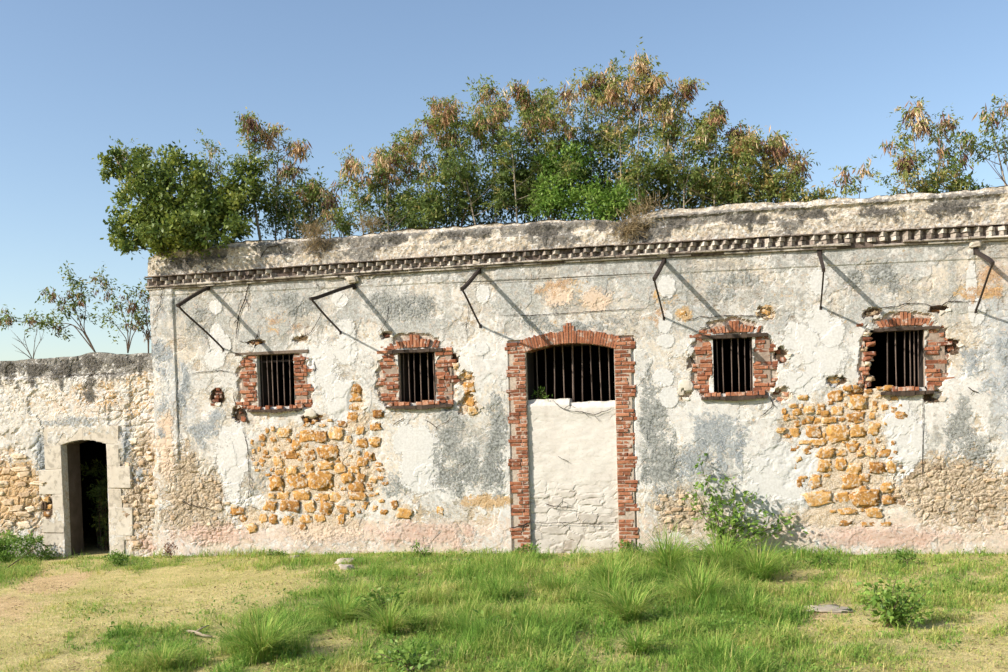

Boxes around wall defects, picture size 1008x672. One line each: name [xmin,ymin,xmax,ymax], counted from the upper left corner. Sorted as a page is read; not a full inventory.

crack [234,284,259,343]
spalling [862,308,879,319]
spalling [929,305,951,315]
spalling [0,448,53,539]
damp [0,339,226,485]
crack [176,360,257,509]
spalling [119,384,417,556]
damp [381,472,410,498]
damp [433,391,508,500]
damp [636,368,753,498]
spalling [766,332,1008,536]
damp [942,331,1008,469]